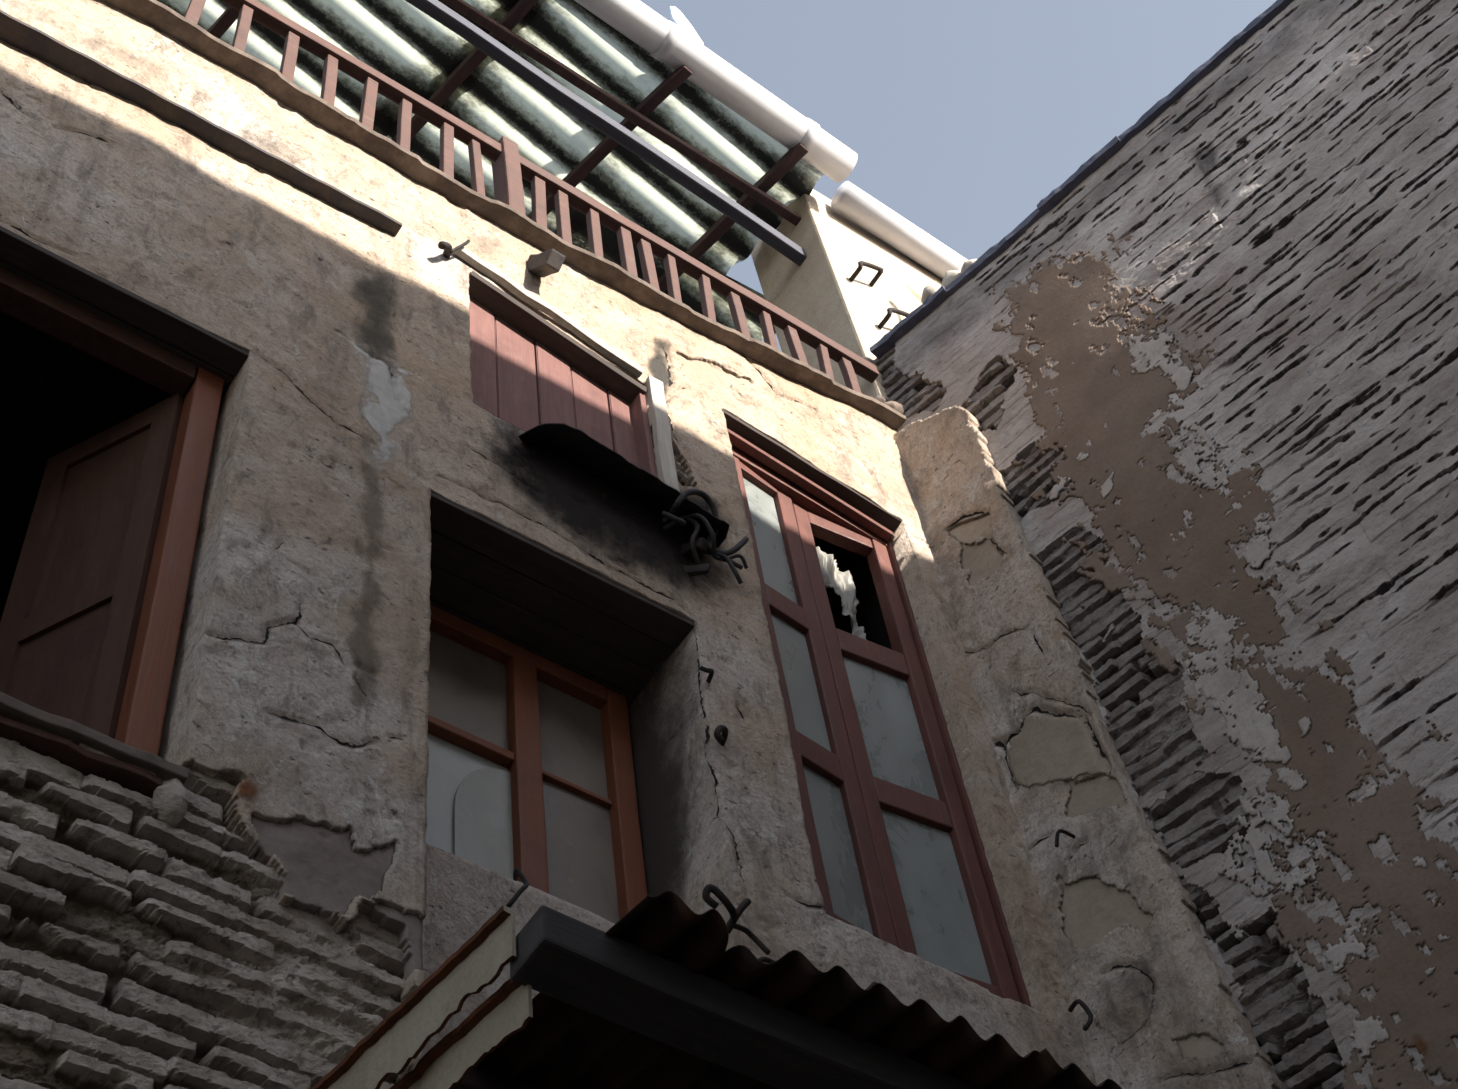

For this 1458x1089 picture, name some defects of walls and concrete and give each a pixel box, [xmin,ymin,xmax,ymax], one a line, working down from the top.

crack [1,221,71,255]
spalling [873,346,947,418]
damp [348,277,411,705]
peeling [949,515,994,543]
crack [217,543,367,696]
crack [268,713,403,748]
peeling [962,233,1458,1089]
spalling [0,737,423,1089]